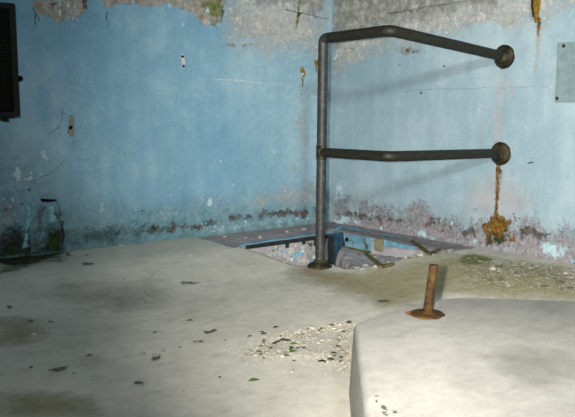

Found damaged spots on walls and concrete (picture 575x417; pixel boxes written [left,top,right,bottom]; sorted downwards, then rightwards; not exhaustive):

peeling [31,0,88,23]
peeling [104,0,327,59]
peeling [332,0,532,34]
peeling [540,0,563,20]
peeling [332,37,389,74]
peeling [166,219,225,233]
peeling [229,190,316,231]
peeling [325,181,575,264]
rust [482,164,515,244]
leakage [0,226,71,274]